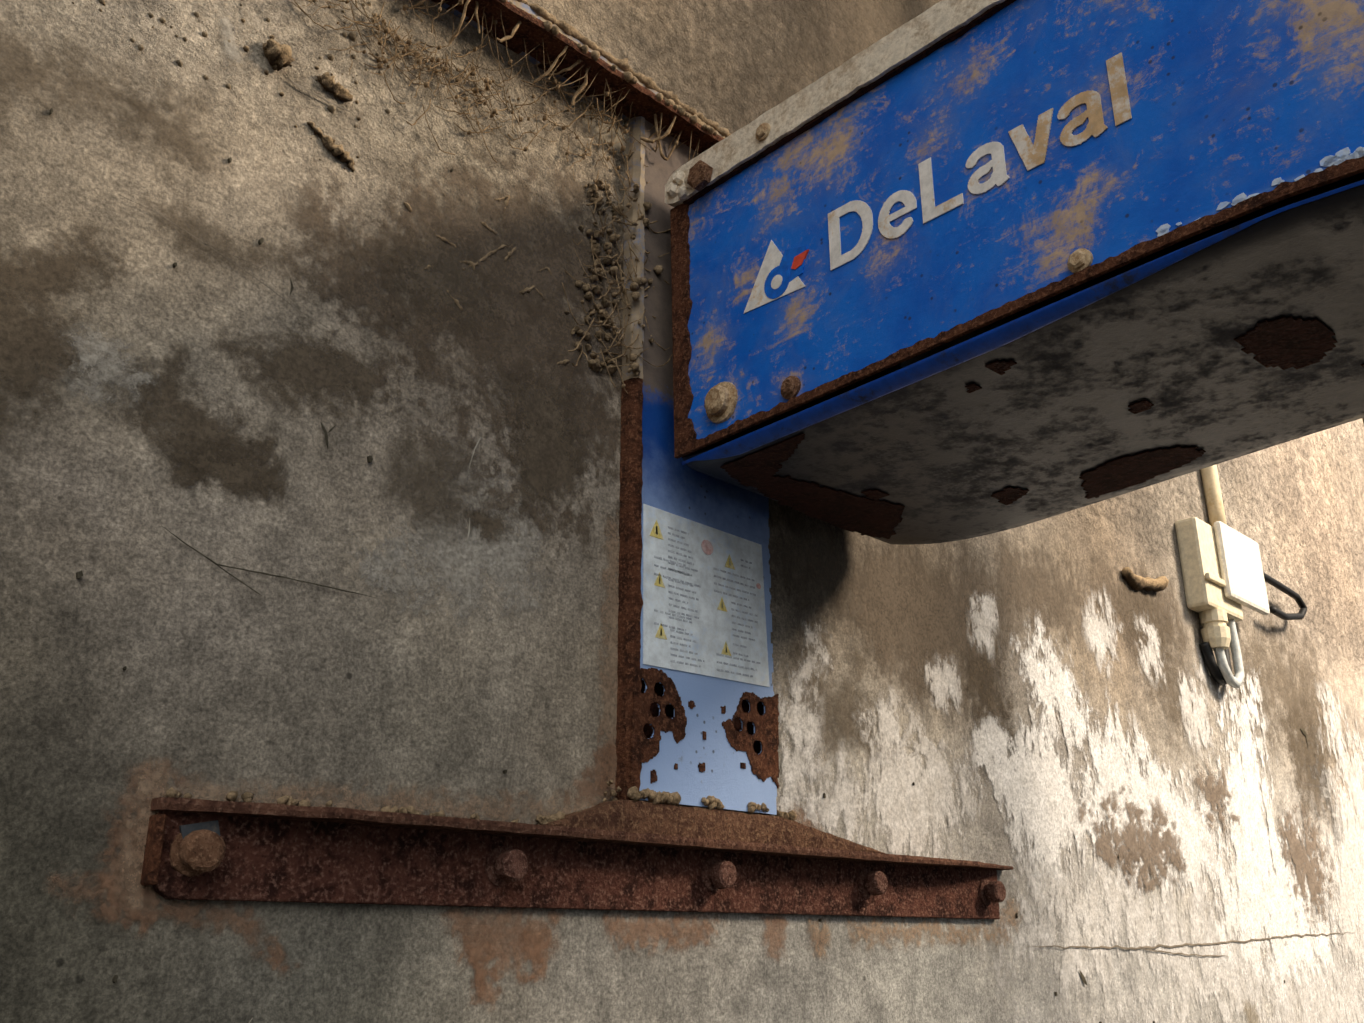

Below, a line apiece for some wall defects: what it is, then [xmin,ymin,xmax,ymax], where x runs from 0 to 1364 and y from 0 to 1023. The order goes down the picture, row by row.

leakage [0,35,210,168]
leakage [0,226,124,440]
leakage [106,345,285,496]
leakage [218,153,624,549]
rust [77,521,696,931]
rust [720,692,780,788]
leakage [769,507,1194,752]
leakage [1225,621,1346,821]
rust [848,900,1018,945]
crack [1028,932,1354,985]